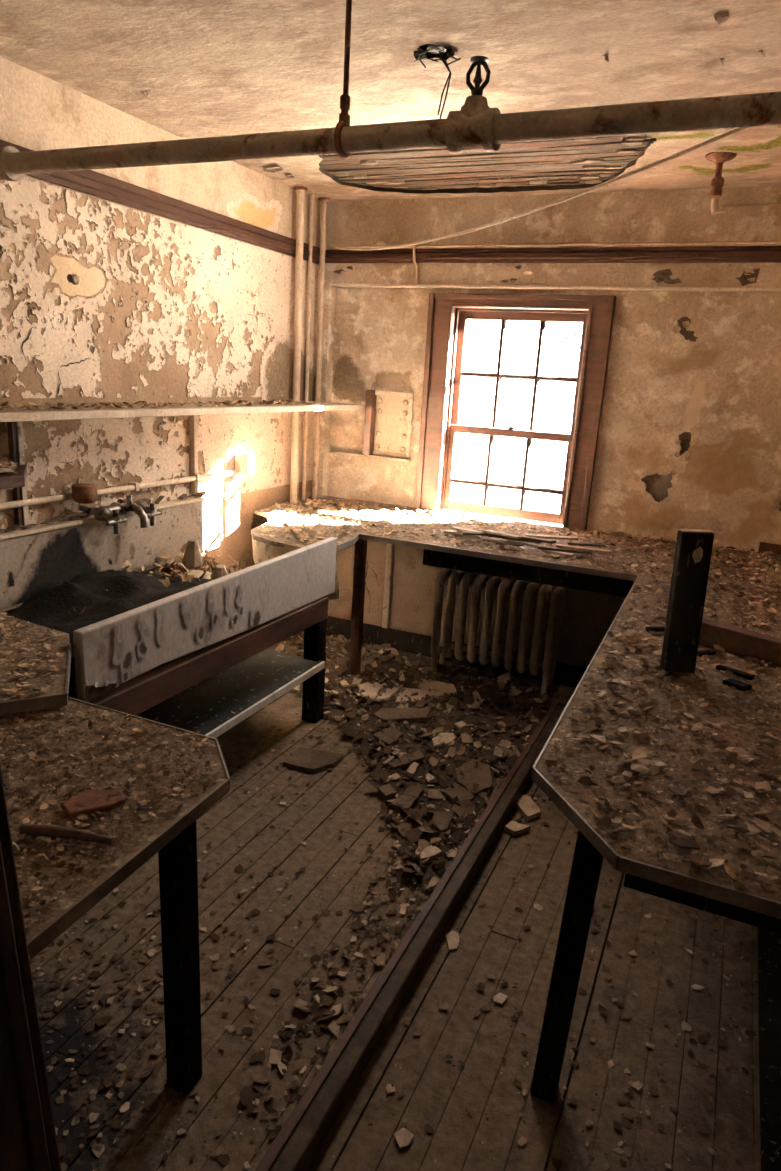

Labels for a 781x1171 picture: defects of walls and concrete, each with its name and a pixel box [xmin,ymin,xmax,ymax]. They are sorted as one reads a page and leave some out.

peeling [263,163,295,178]
flaking render [318,138,657,194]
peeling [483,265,535,284]
peeling [646,268,682,286]
peeling [736,268,760,286]
peeling [0,177,319,532]
flaking render [672,313,701,347]
flaking render [622,428,696,504]
peeling [0,616,61,697]
peeling [261,495,781,884]
peeling [0,697,221,925]